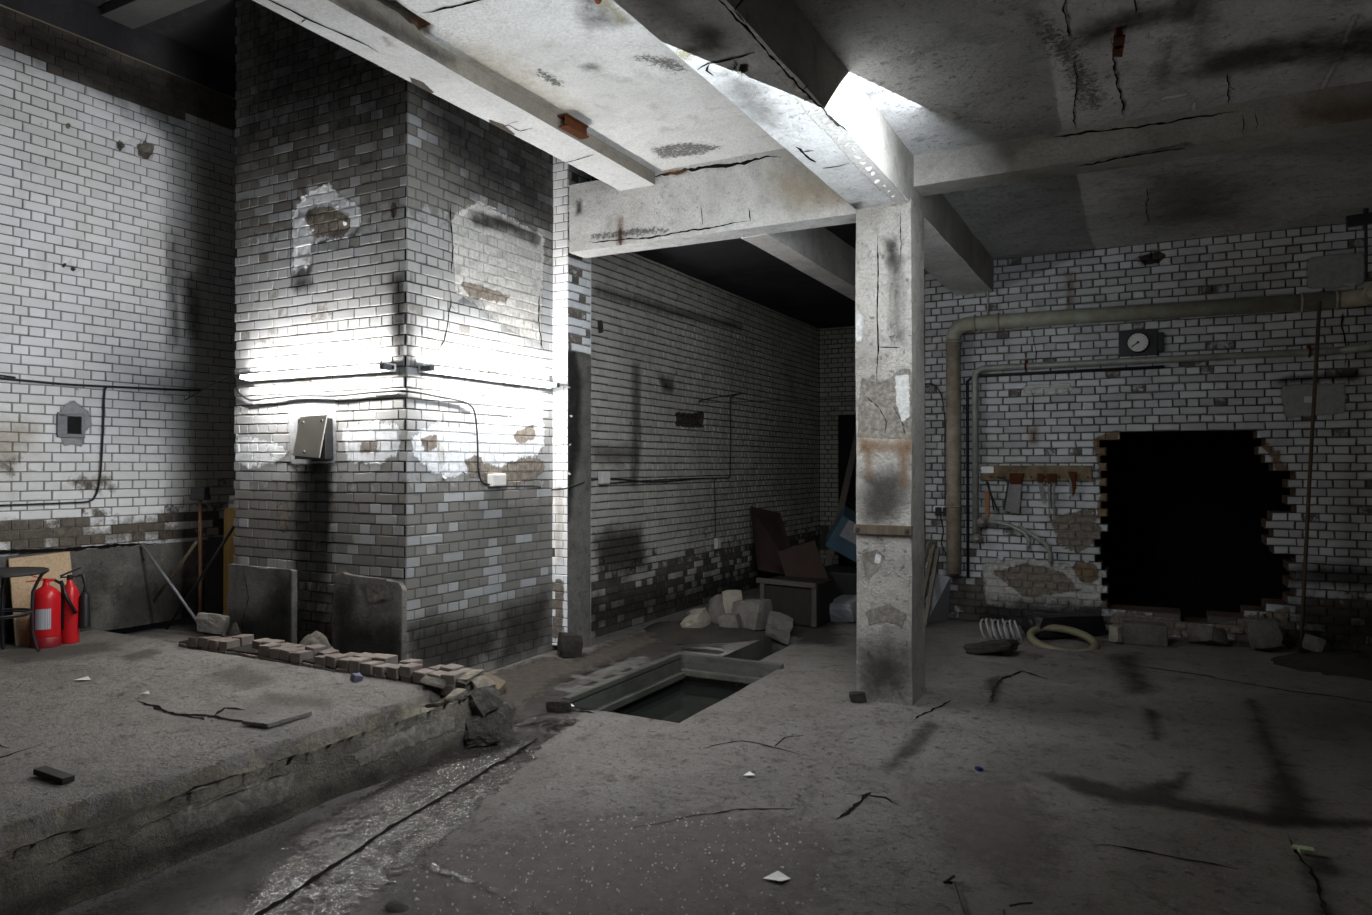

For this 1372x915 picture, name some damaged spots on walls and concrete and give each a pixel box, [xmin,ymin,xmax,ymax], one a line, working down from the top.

crack [425,0,481,13]
crack [655,0,851,177]
crack [1046,0,1258,139]
peeling [291,182,361,290]
crack [588,209,751,243]
peeling [982,431,1291,637]
spalling [862,550,885,580]
spalling [866,604,906,626]
crack [987,670,1048,702]
crack [1119,663,1372,703]
crack [138,701,244,722]
crack [1288,836,1330,915]